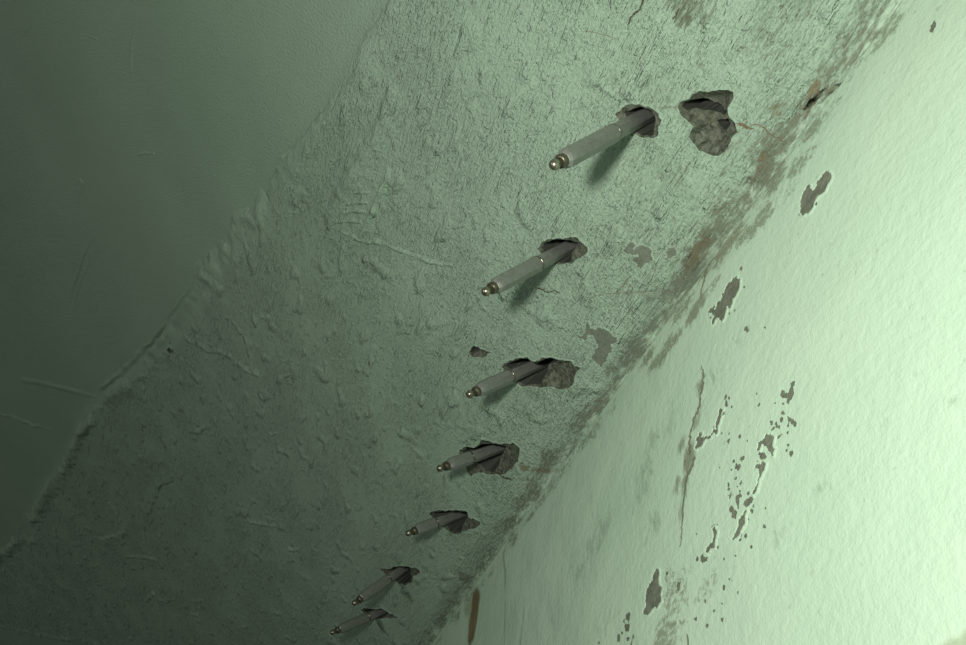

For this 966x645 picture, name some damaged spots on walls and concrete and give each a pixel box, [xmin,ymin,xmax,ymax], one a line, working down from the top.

crack [583,0,644,40]
damp [808,0,901,103]
spalling [675,87,740,158]
peeling [798,169,834,218]
spalling [501,320,619,392]
damp [495,99,821,544]
peeling [707,266,745,327]
spalling [457,437,522,479]
crack [680,366,704,545]
peeling [694,381,796,548]
peeling [696,524,736,562]
peeling [642,566,668,618]